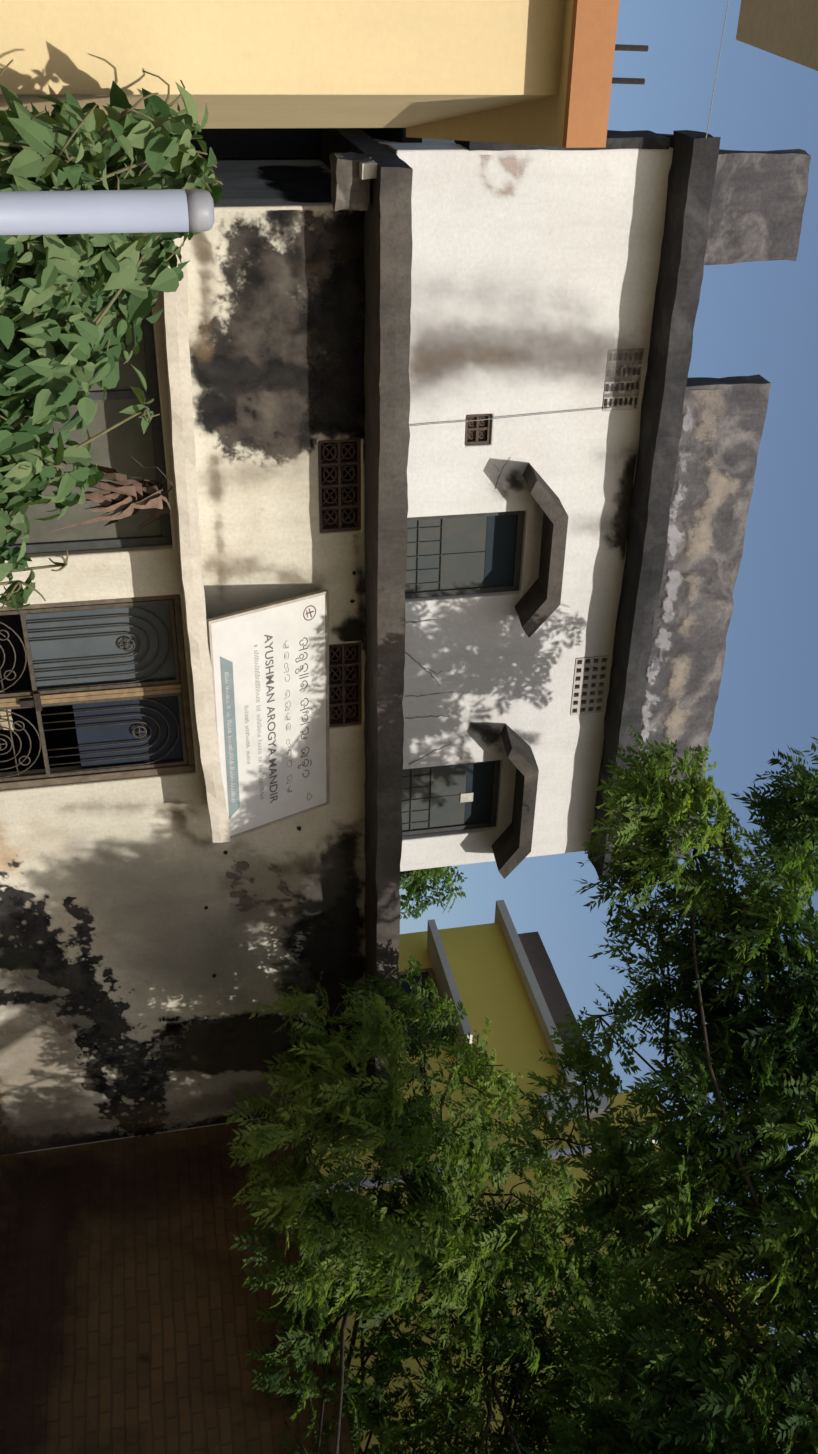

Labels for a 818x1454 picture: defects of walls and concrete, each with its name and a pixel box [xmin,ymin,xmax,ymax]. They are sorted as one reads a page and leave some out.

water stain [190,165,366,465]
water stain [415,330,605,380]
crack [405,619,456,765]
water stain [274,827,366,1098]
water stain [0,1079,296,1157]